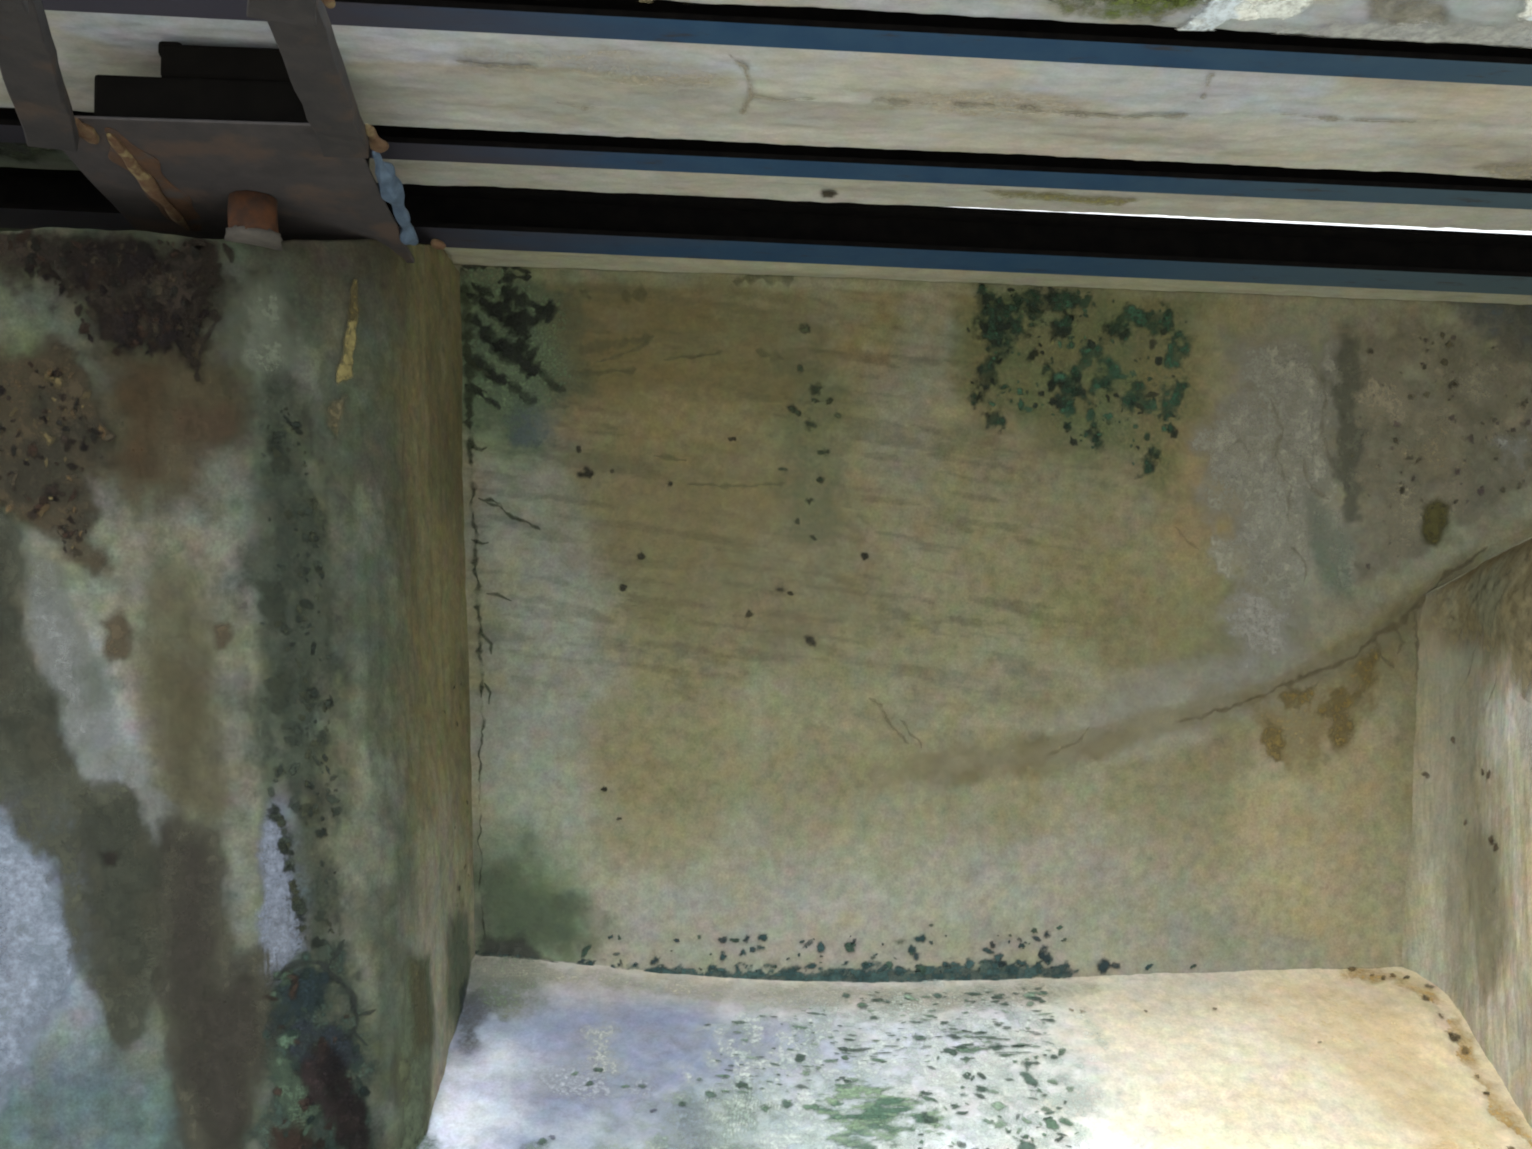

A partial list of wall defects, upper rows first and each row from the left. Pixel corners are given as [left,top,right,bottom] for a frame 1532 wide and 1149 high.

mould [460,265,587,453]
mould [963,283,1199,484]
damp [0,285,437,1149]
crack [460,268,541,939]
crack [1176,548,1486,722]
damp [455,924,1120,1149]